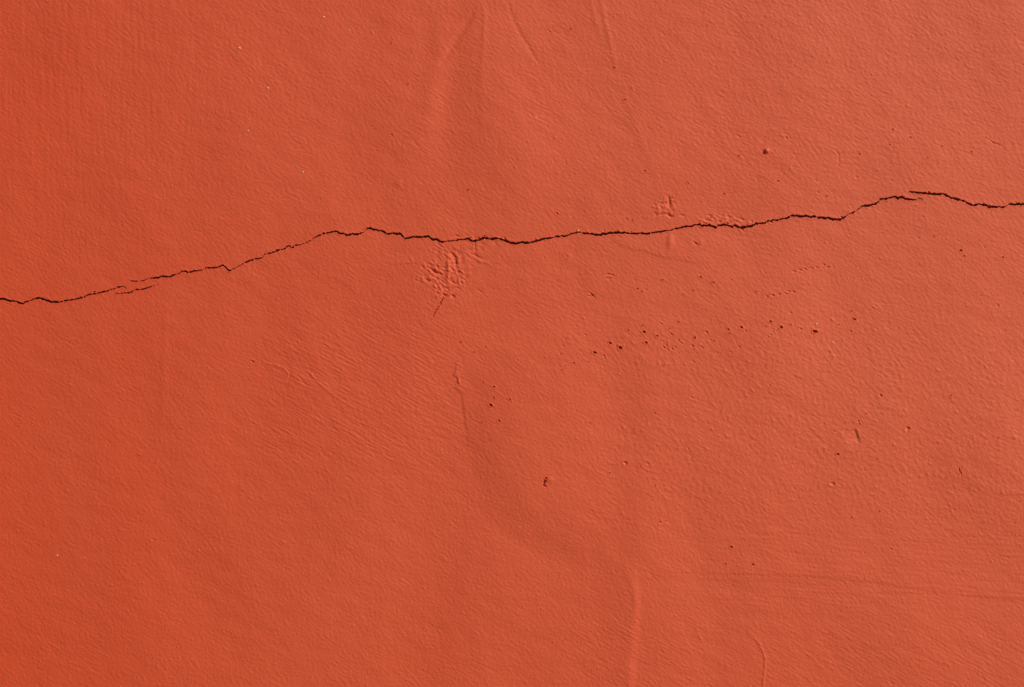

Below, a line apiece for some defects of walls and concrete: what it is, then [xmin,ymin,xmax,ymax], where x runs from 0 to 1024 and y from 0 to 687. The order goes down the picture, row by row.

crack [0,188,1024,306]